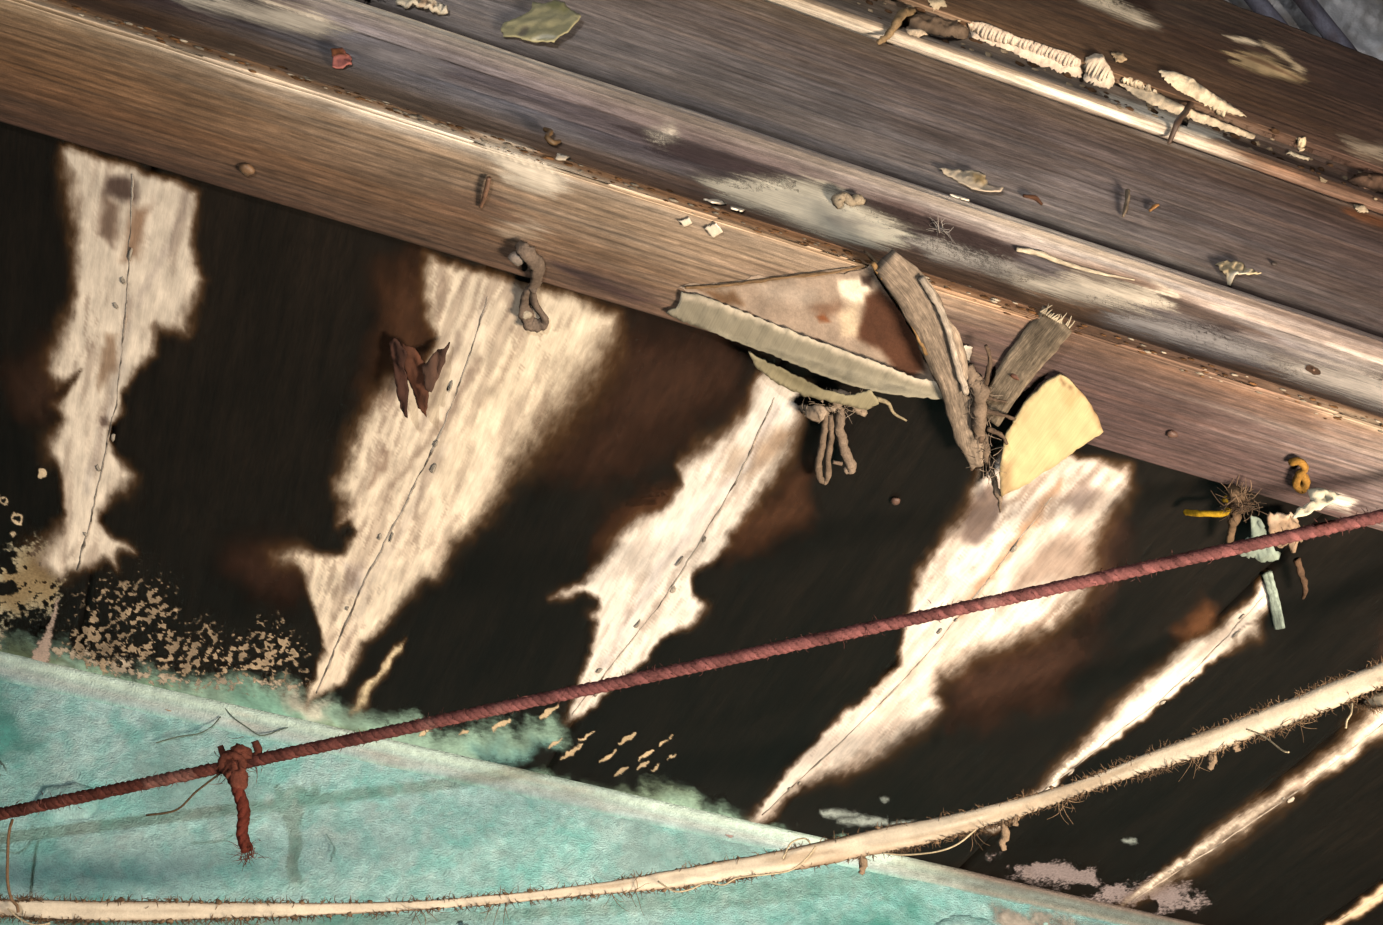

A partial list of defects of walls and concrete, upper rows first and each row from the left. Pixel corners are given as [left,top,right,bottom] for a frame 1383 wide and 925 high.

leakage [630,131,772,177]
leakage [852,195,1016,262]
spalling [857,0,1383,213]
leakage [0,146,748,711]
leakage [549,731,595,760]
leakage [599,732,675,776]
leakage [539,373,811,719]
leakage [751,455,1129,825]
leakage [1037,580,1269,793]
leakage [988,708,1383,914]
leakage [1325,884,1383,925]